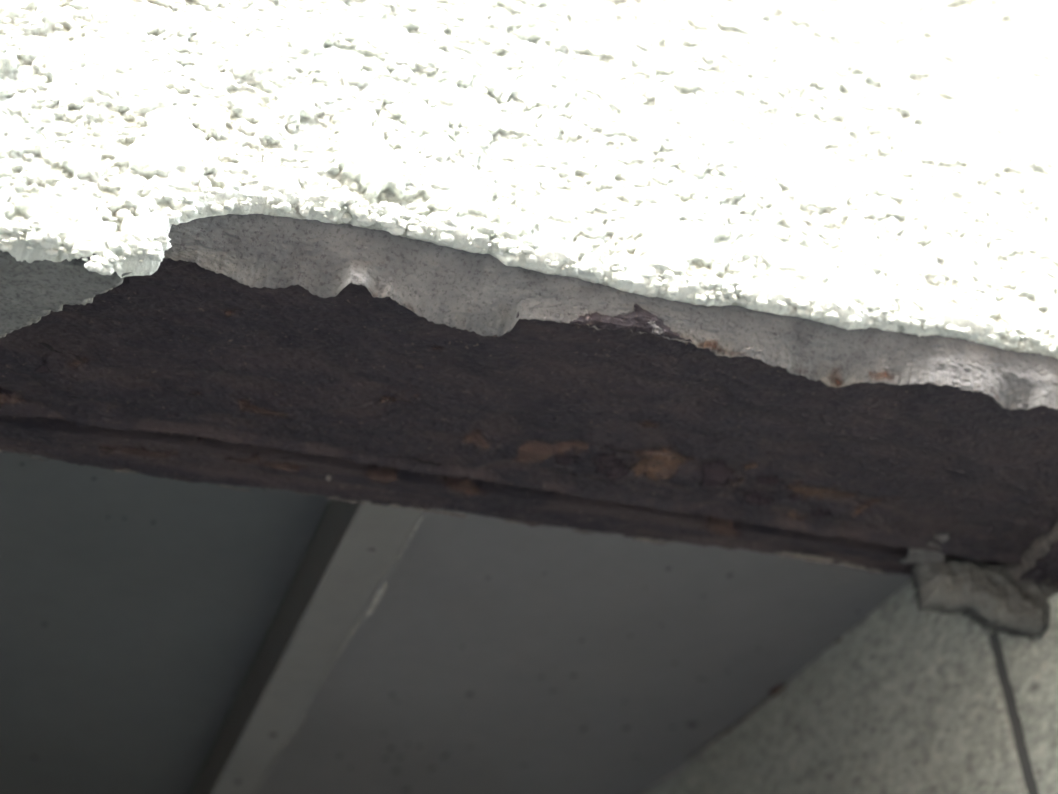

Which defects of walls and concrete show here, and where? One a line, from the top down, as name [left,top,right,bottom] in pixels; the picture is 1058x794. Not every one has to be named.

flaking render [164,214,1058,410]
rust [513,440,588,463]
peeling [752,550,885,574]
peeling [898,532,951,565]
rust [998,519,1058,586]